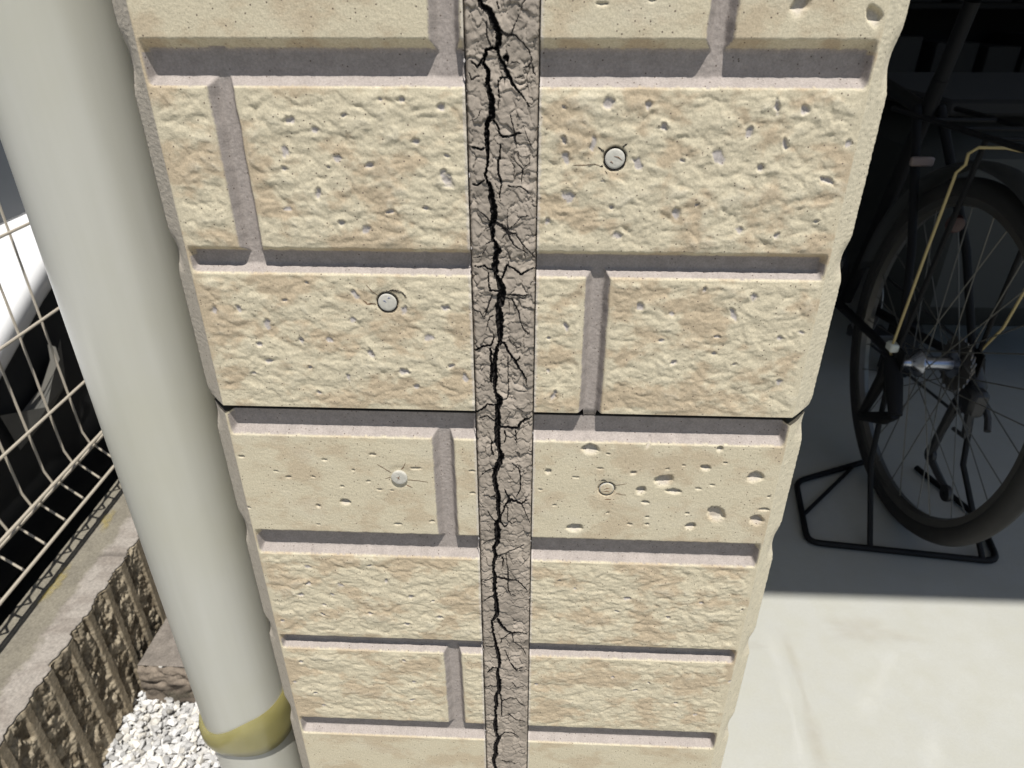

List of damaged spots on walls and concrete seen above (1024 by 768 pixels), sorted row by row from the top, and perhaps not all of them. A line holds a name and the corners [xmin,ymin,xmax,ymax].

crack [463,0,541,768]